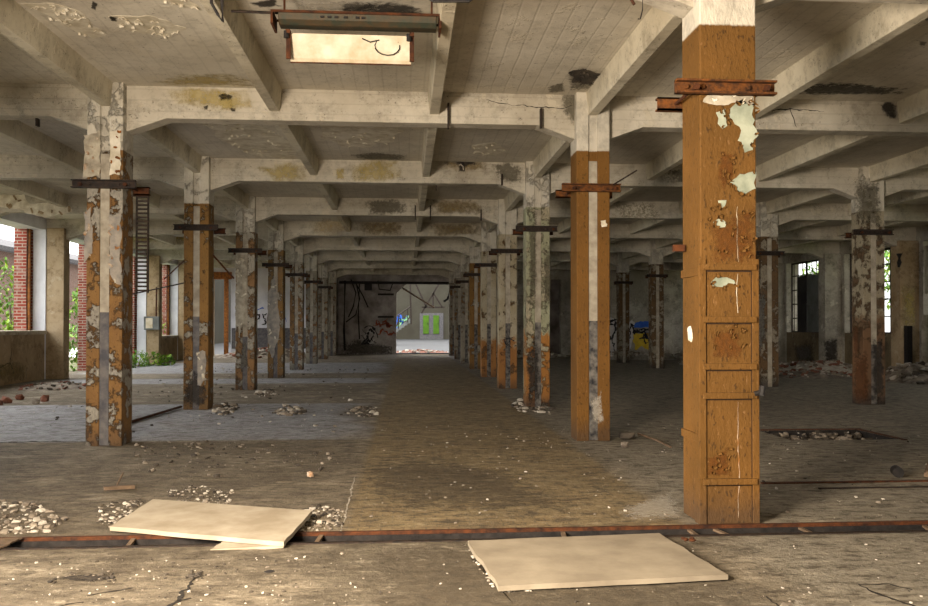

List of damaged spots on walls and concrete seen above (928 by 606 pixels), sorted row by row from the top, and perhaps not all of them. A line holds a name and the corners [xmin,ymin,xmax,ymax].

peeling [703,95,760,152]
damp [801,83,904,119]
peeling [83,130,121,179]
peeling [719,151,757,196]
peeling [707,200,757,261]
crack [61,588,131,606]
crack [167,578,196,606]
crack [858,583,915,606]